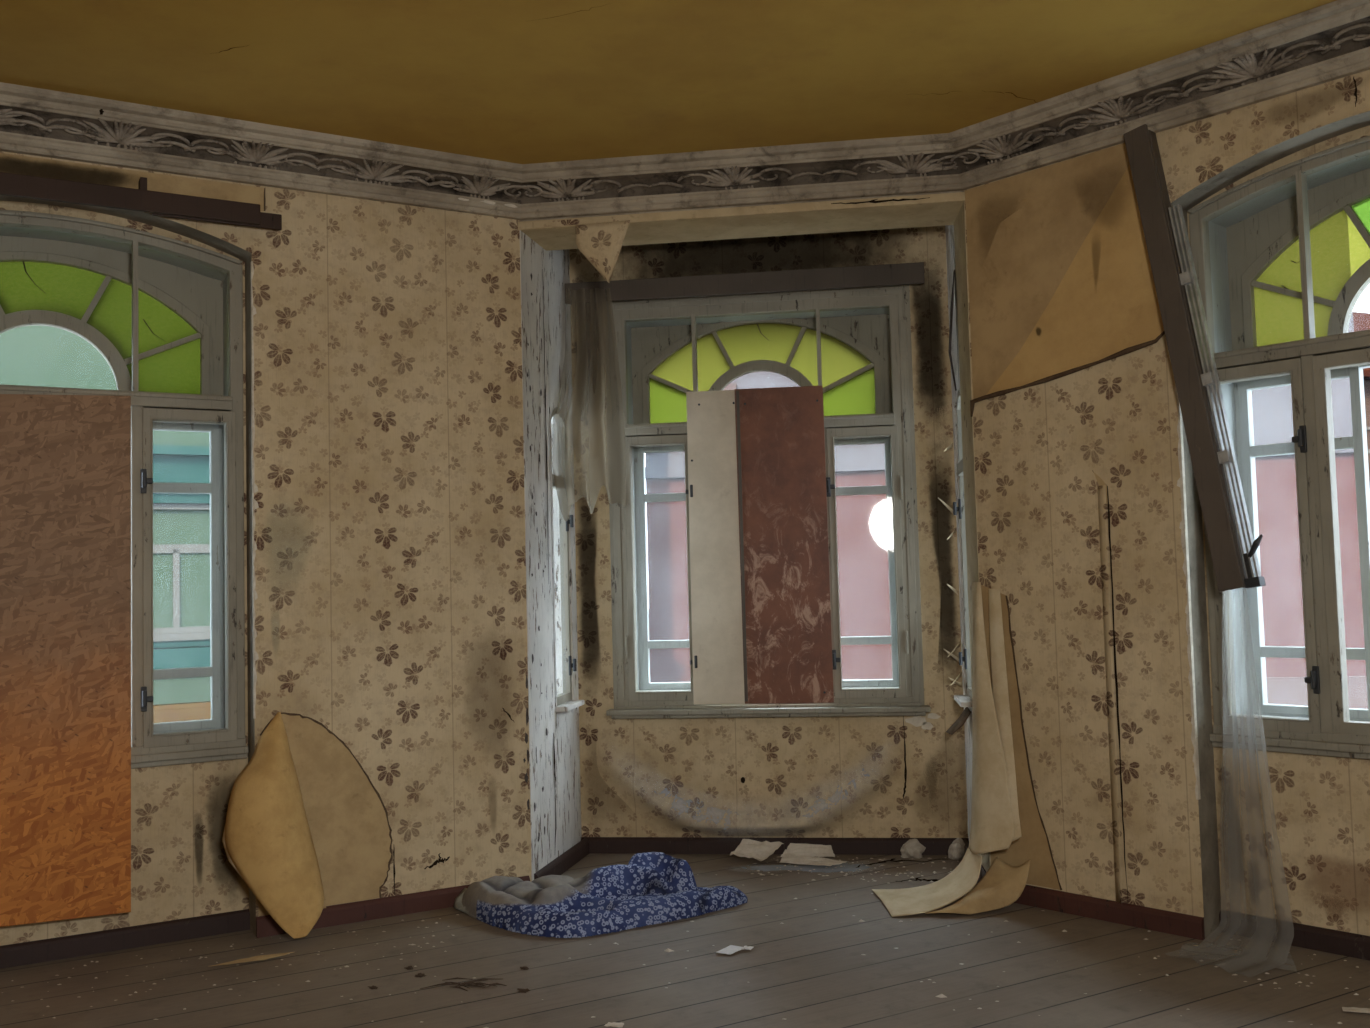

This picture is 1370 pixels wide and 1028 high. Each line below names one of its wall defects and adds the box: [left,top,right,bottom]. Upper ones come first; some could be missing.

flaking render [250,261,259,719]
peeling [281,714,391,906]
flaking render [905,713,941,730]
peeling [981,585,1060,890]